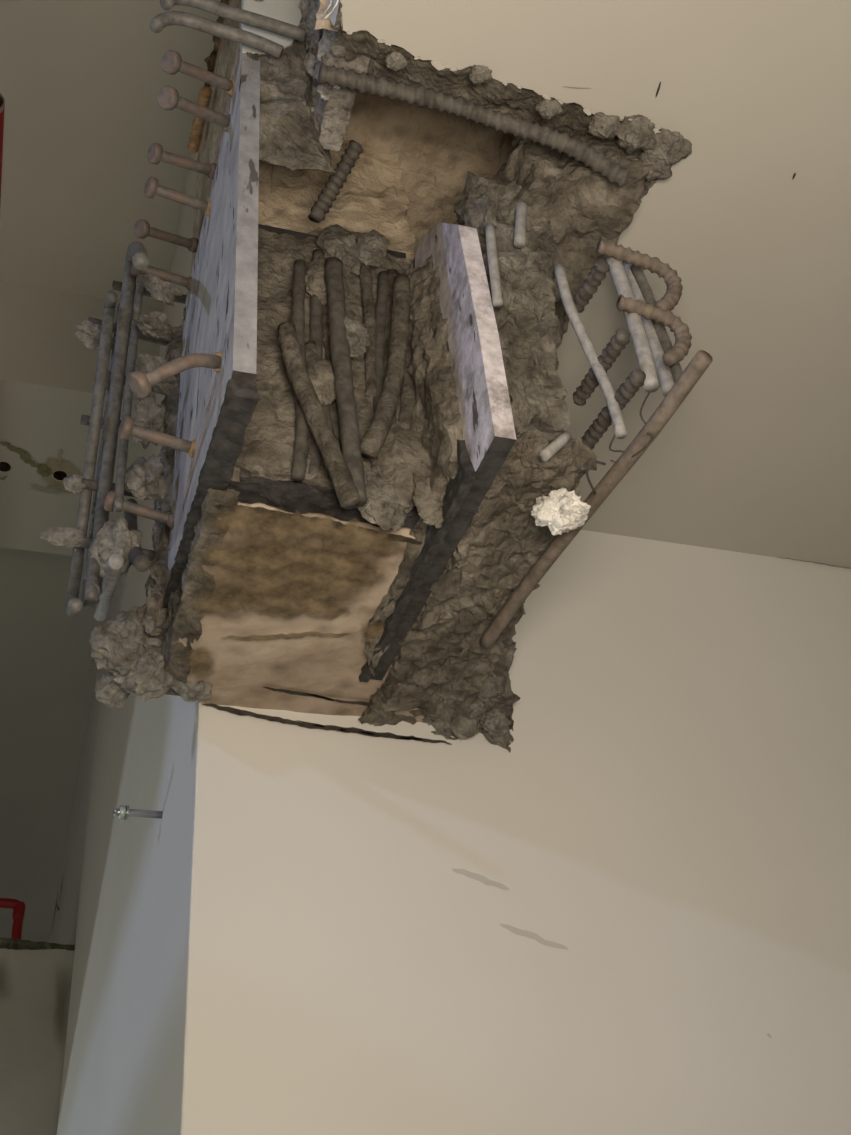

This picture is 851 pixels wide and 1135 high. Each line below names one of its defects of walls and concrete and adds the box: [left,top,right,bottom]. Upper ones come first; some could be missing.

spalling [149,0,692,223]
spalling [485,223,503,308]
spalling [514,185,527,249]
leakage [0,442,80,493]
spalling [66,241,169,621]
spalling [277,249,410,509]
spalling [422,256,713,752]